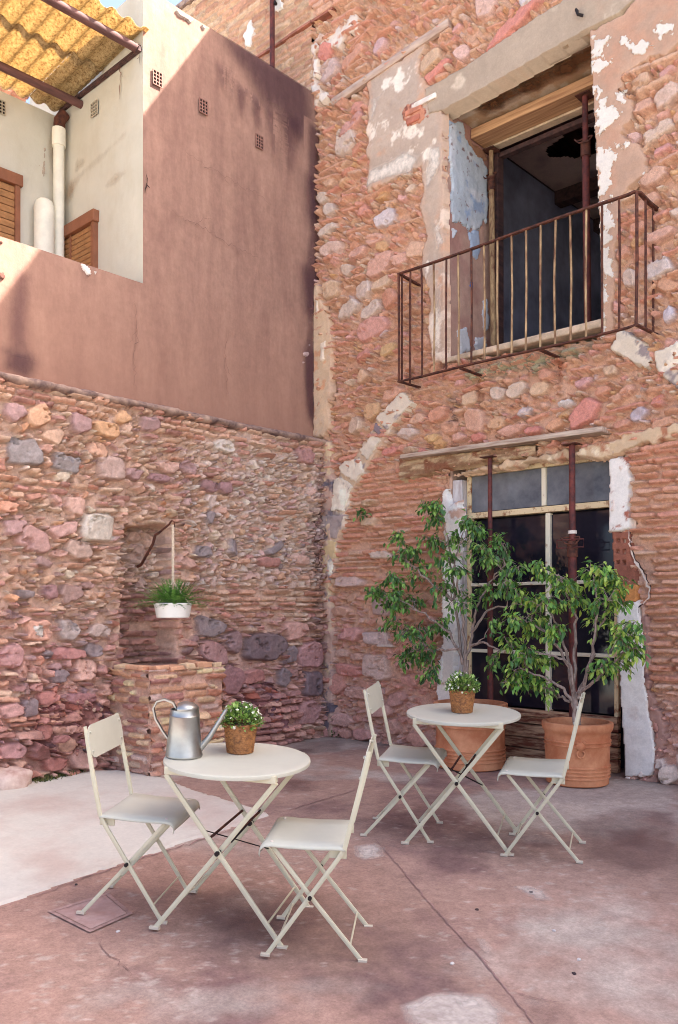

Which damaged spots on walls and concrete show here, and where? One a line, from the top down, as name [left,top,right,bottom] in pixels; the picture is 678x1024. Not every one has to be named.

leakage [230,40,306,136]
peeling [366,44,490,363]
peeling [590,0,678,343]
peeling [608,454,636,533]
crack [628,532,651,613]